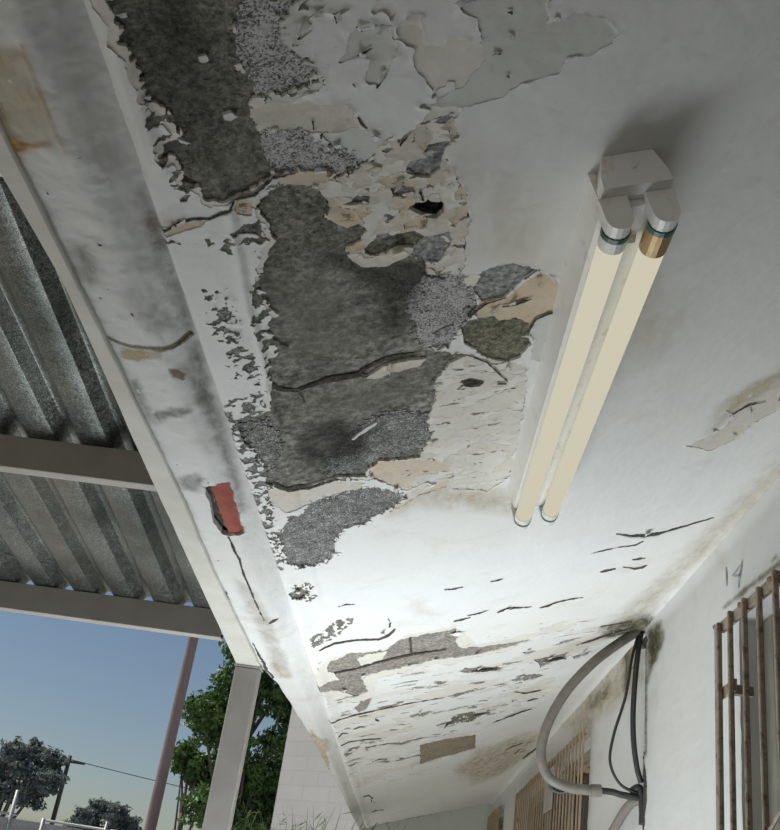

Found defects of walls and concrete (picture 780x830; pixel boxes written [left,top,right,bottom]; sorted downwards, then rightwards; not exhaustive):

crack [160,173,296,245]
spalling [90,0,619,572]
crack [108,331,194,381]
crack [272,353,421,406]
peeling [687,377,780,451]
crack [227,537,278,624]
peeling [289,582,317,601]
crack [592,517,714,574]
water stain [605,618,663,677]
peeling [313,620,613,788]